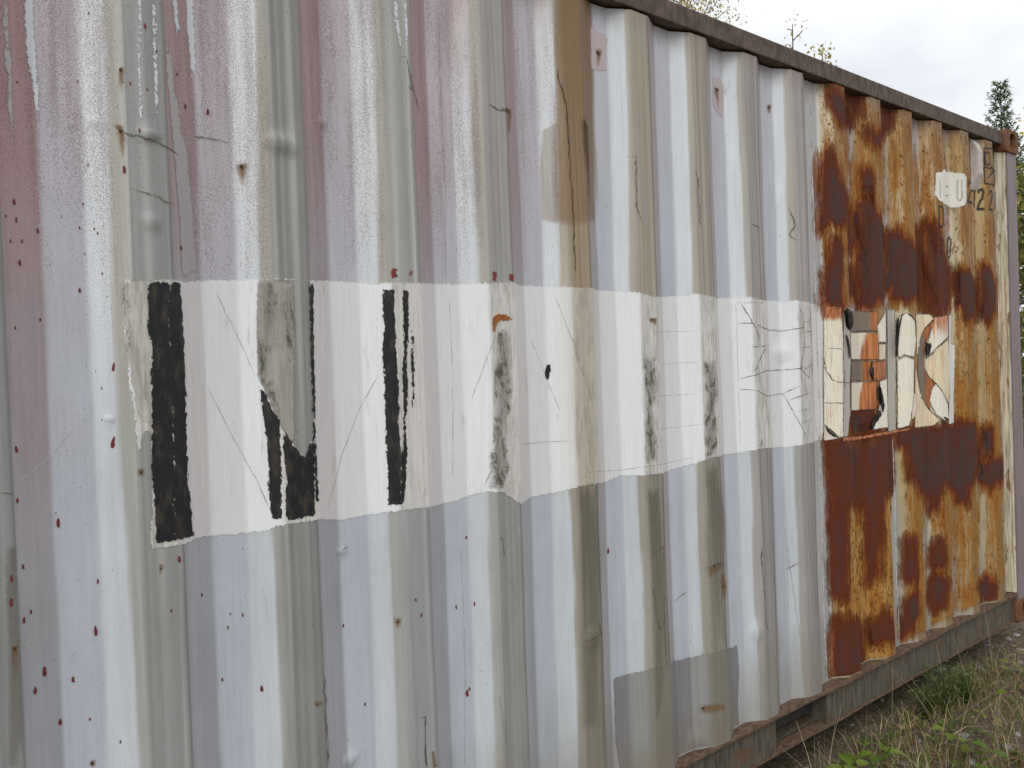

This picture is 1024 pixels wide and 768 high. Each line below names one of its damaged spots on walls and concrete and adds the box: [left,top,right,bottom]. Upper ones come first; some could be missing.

crack [557,72,576,269]
leakage [491,332,511,488]
leakage [645,360,656,460]
leakage [705,364,717,456]
crack [736,302,947,446]
corrosion [811,83,1005,679]